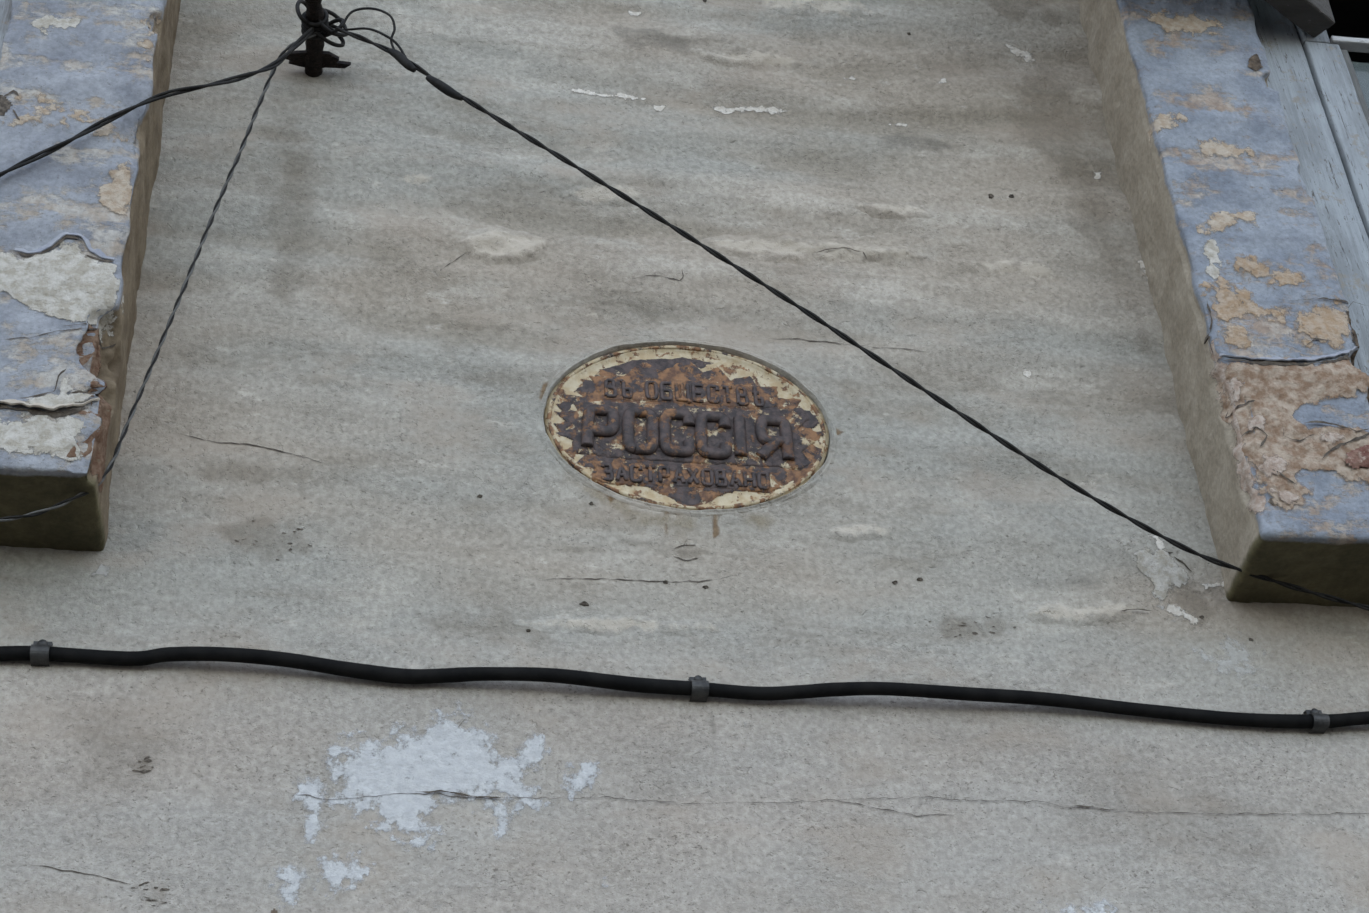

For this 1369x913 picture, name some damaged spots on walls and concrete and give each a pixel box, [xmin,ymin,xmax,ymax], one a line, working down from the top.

peeling [1147,112,1188,142]
peeling [1197,137,1255,160]
peeling [0,232,124,492]
peeling [1196,211,1369,515]
peeling [269,707,551,913]
peeling [563,762,599,801]